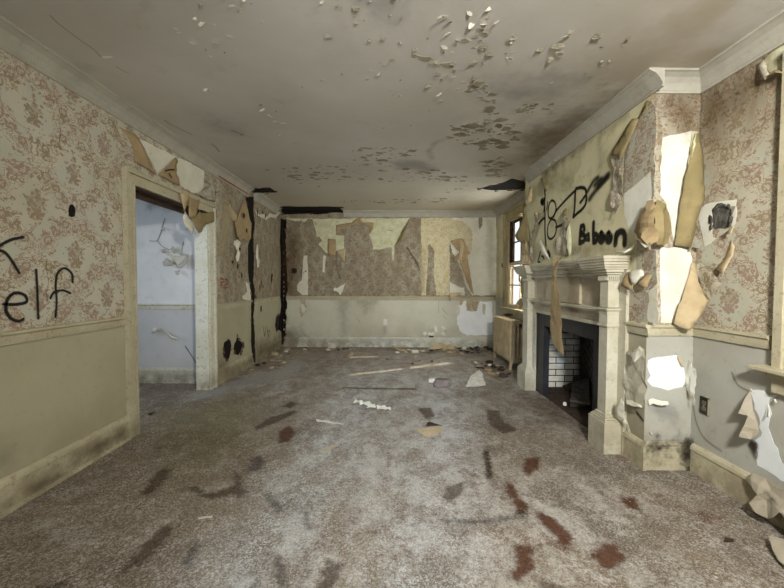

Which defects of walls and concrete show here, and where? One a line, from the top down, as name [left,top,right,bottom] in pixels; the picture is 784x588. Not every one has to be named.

peeling [412,7,526,192]
peeling [282,147,417,187]
spalling [708,203,733,230]
crack [245,196,256,363]
crack [279,218,289,344]
peeling [455,299,493,336]
peeling [615,346,697,433]
peeling [738,389,784,482]